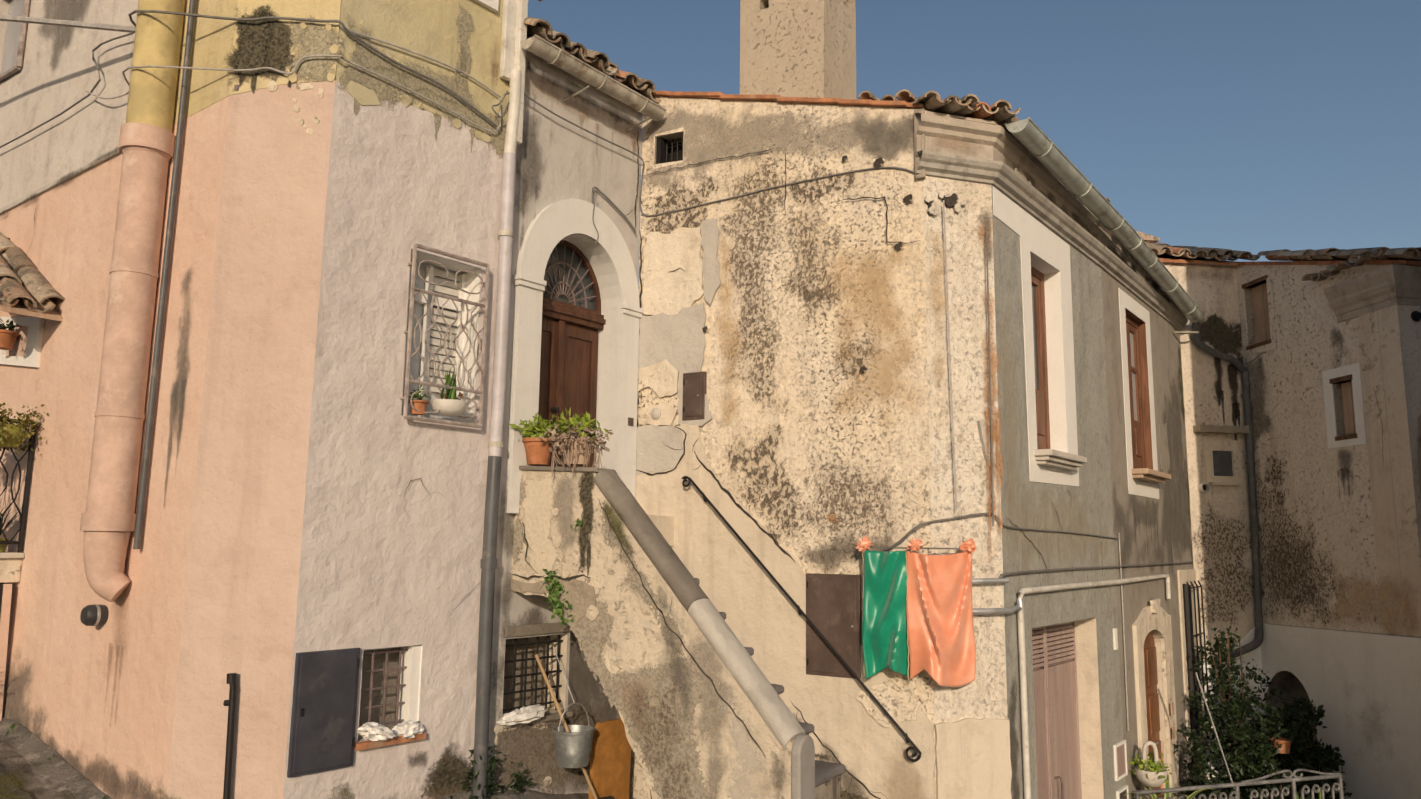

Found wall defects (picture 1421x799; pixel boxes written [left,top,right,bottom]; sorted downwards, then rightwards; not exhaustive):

leakage [42,0,86,67]
leakage [224,5,335,93]
leakage [165,321,188,492]
leakage [554,466,597,576]
spalling [647,155,893,540]
corrosion [986,299,1003,551]
leakage [1116,349,1193,570]
leakage [1200,314,1270,444]
spalling [492,476,709,799]